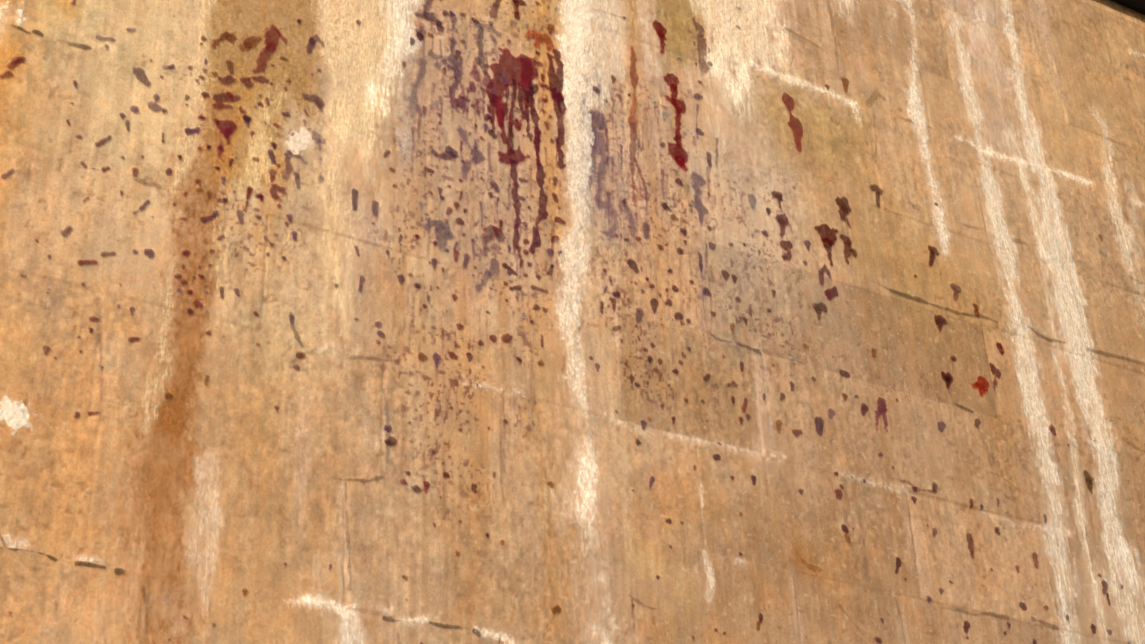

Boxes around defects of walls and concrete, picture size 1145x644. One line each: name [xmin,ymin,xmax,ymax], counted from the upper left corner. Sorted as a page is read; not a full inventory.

leakage [782,93,803,152]
leakage [748,186,857,320]
leakage [928,203,947,266]
leakage [120,0,687,589]
leakage [728,361,750,424]
leakage [972,342,1004,396]
leakage [1084,470,1094,493]